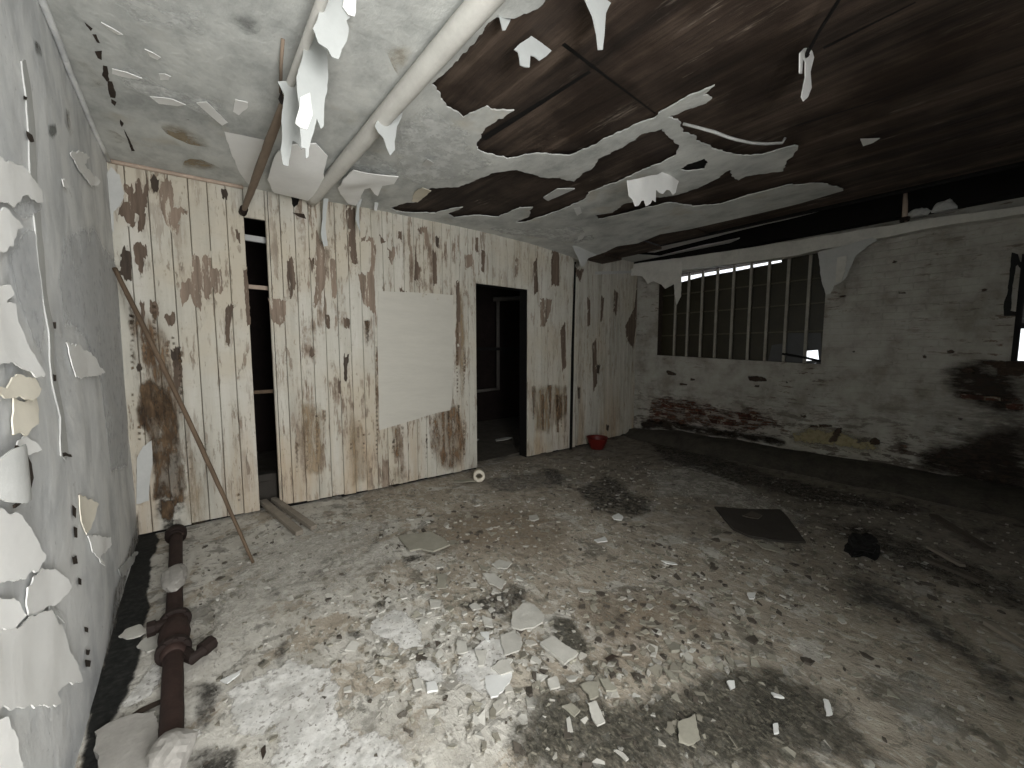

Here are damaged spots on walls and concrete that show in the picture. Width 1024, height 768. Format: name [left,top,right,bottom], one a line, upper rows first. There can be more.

peeling [278,0,356,166]
peeling [395,0,1024,221]
flaking render [0,156,46,455]
peeling [399,226,439,292]
peeling [587,262,682,348]
peeling [818,237,877,297]
damp [947,361,1020,412]
peeling [0,508,83,768]
damp [81,380,199,768]